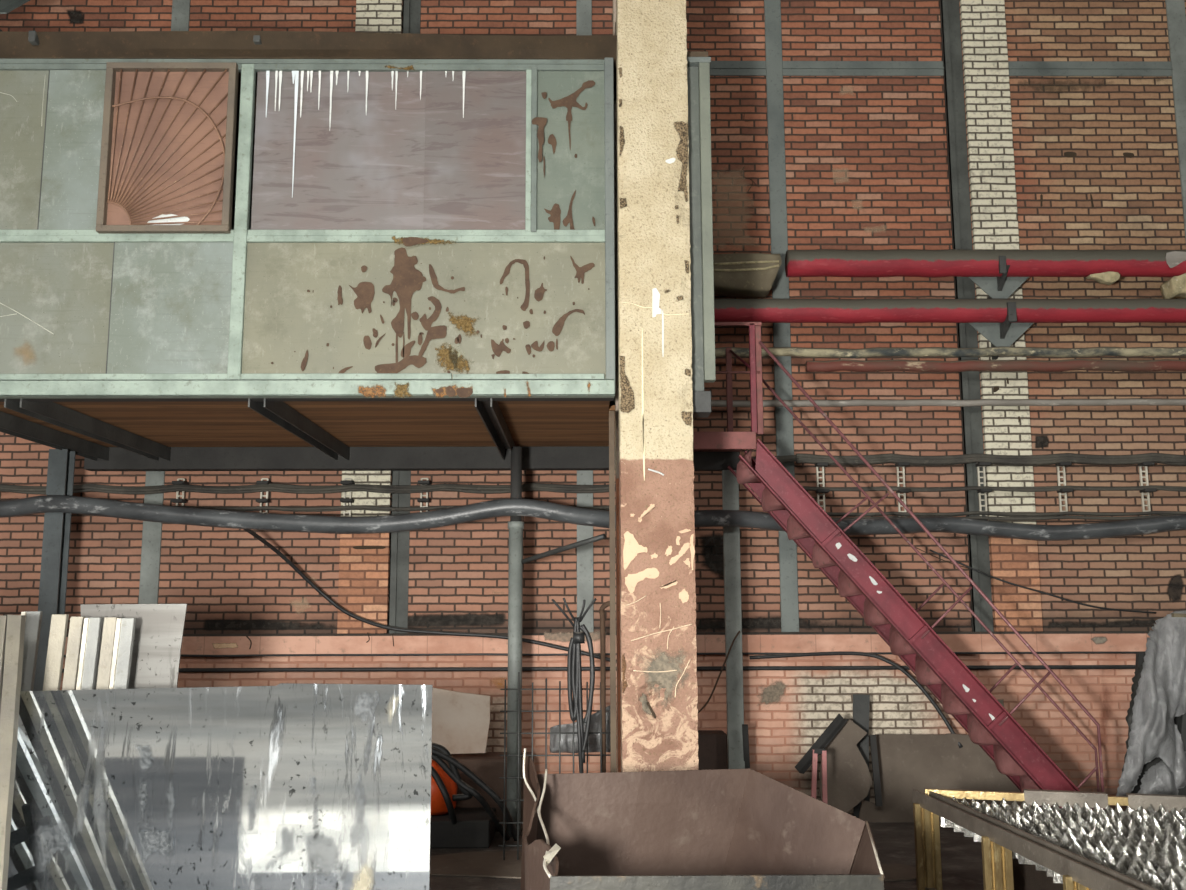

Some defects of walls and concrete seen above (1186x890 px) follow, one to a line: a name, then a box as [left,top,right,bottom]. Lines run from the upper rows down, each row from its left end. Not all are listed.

leakage [391,71,422,108]
leakage [275,71,369,197]
spalling [674,121,688,224]
rust [448,312,478,336]
rust [358,383,411,398]
rust [432,343,473,398]
spalling [620,356,635,413]
spalling [682,411,692,426]
peeling [623,504,695,603]
spalling [640,694,656,718]